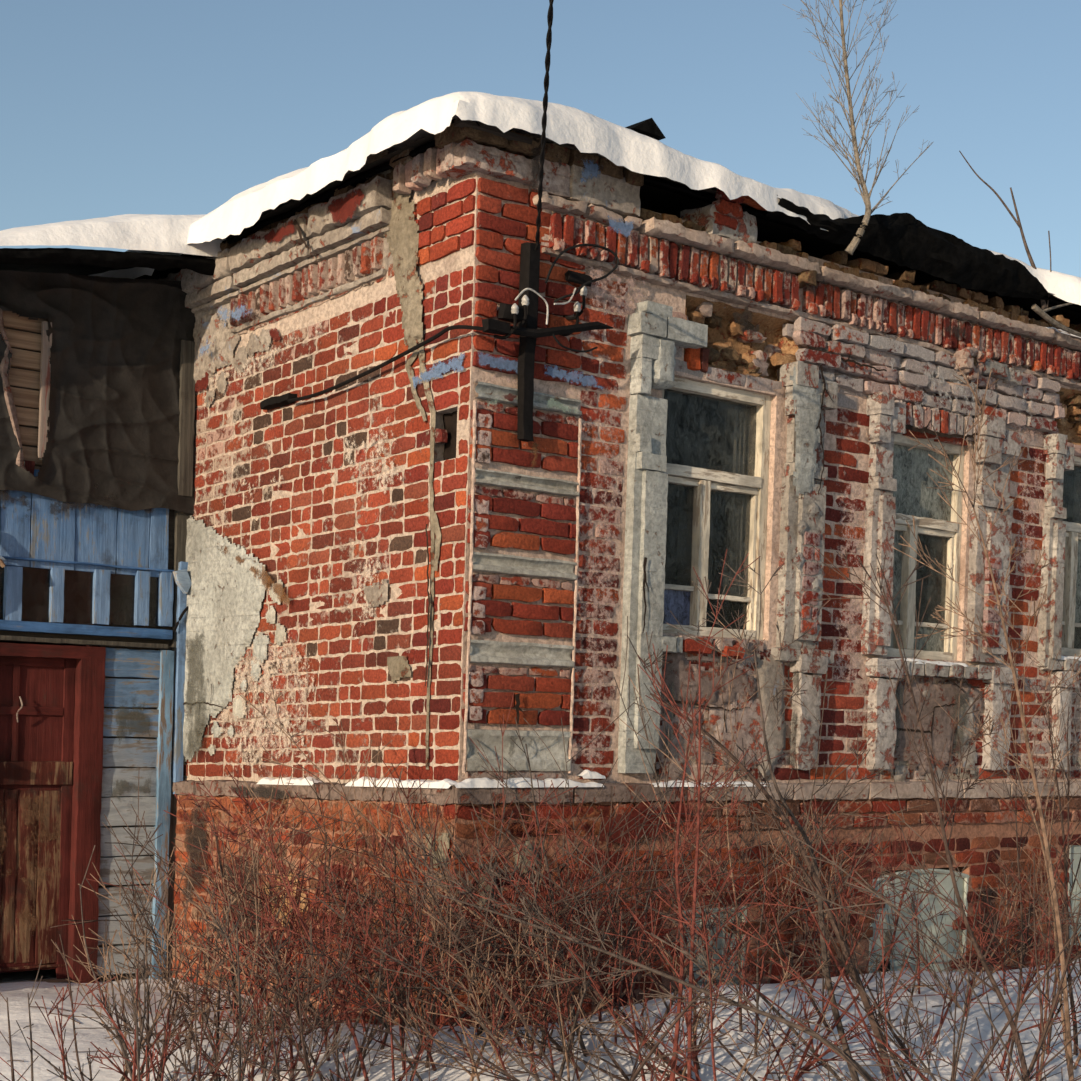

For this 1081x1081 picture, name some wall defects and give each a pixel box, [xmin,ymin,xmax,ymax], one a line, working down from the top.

spalling [245,219,295,243]
spalling [327,189,364,223]
crack [365,149,441,770]
spalling [684,295,821,535]
spalling [1054,387,1081,445]
peeling [183,515,286,764]